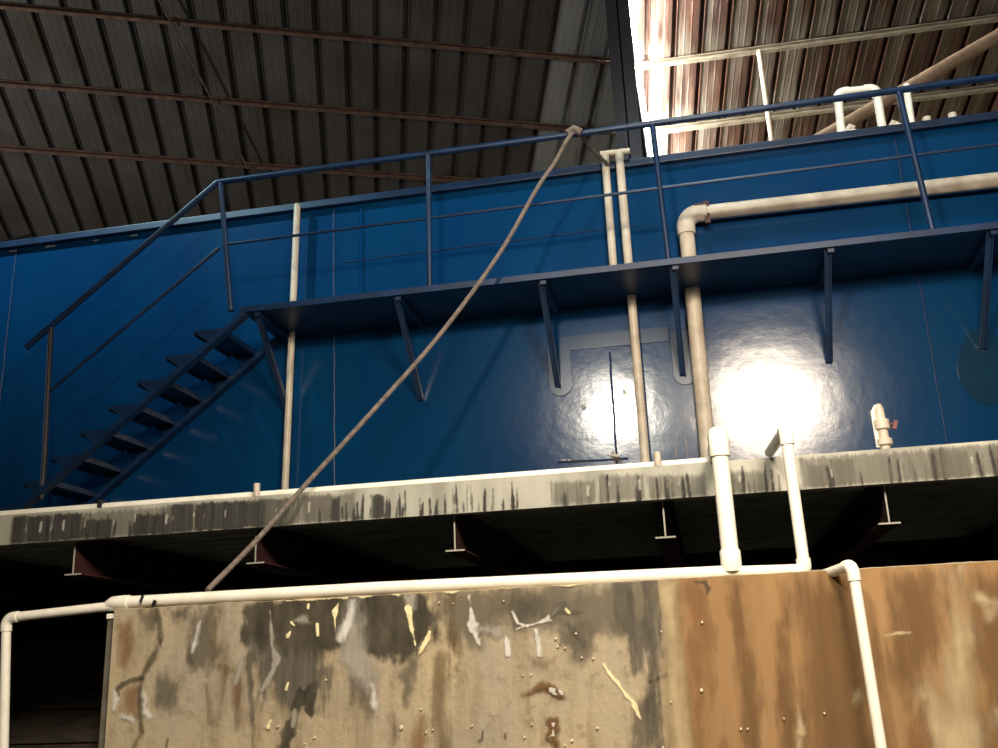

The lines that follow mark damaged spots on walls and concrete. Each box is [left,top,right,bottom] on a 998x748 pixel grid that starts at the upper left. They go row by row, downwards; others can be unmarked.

water stain [11,491,406,544]
water stain [419,486,465,515]
water stain [554,473,705,505]
water stain [731,465,781,492]
water stain [799,444,998,487]
crack [115,607,162,748]
water stain [234,580,691,748]
rust [667,561,998,748]